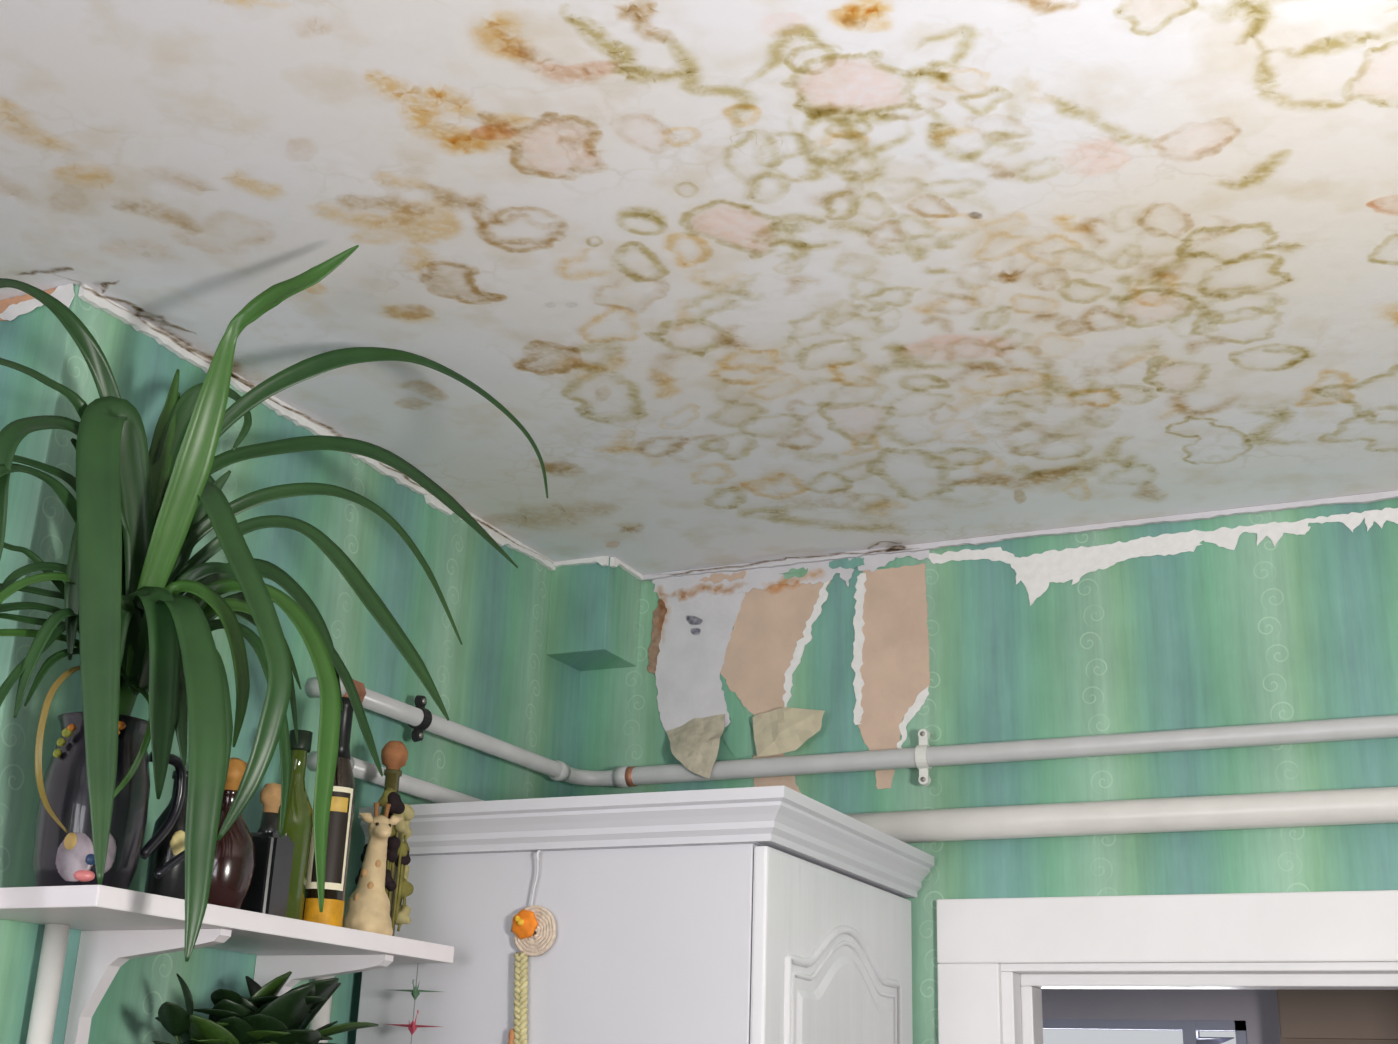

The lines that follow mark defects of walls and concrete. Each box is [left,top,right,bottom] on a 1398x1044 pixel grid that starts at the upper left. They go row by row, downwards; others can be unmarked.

flaking render [0,288,56,321]
flaking render [699,571,831,716]
flaking render [858,564,930,751]
flaking render [753,776,802,794]
flaking render [875,769,895,789]